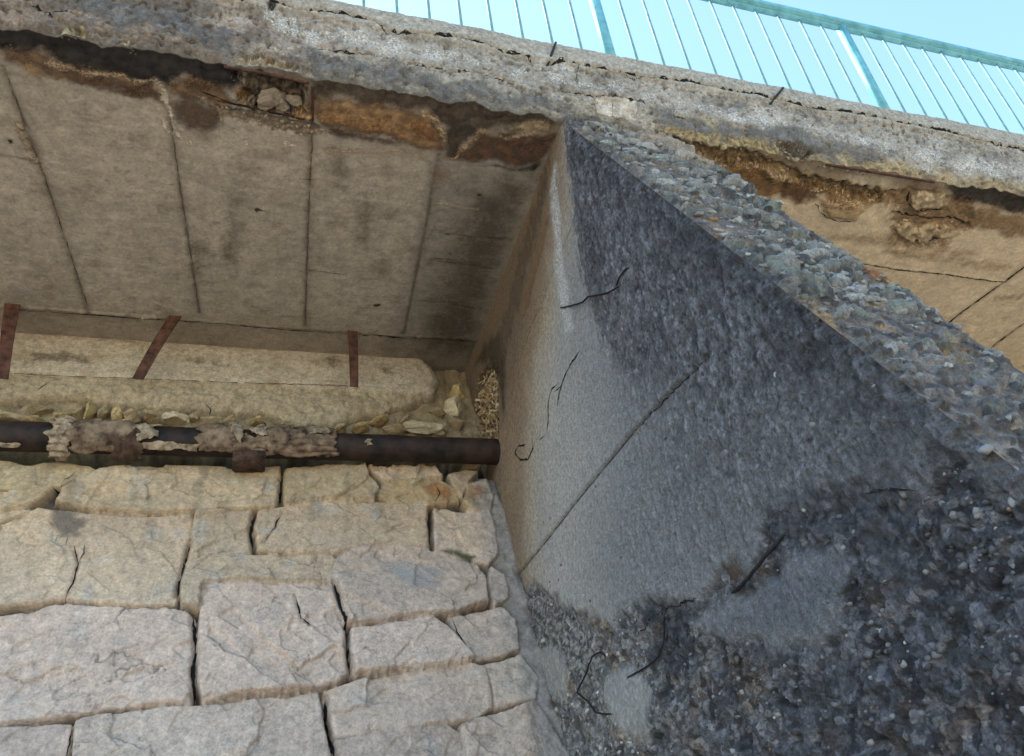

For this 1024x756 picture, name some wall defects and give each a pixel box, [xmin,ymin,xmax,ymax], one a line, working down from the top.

spalling [208,53,331,135]
spalling [655,126,979,247]
crack [515,350,710,573]
crack [249,478,283,552]
crack [55,538,85,602]
crack [177,547,190,597]
crack [190,618,198,706]
crack [334,584,350,674]
crack [638,598,695,635]
crack [323,703,335,756]